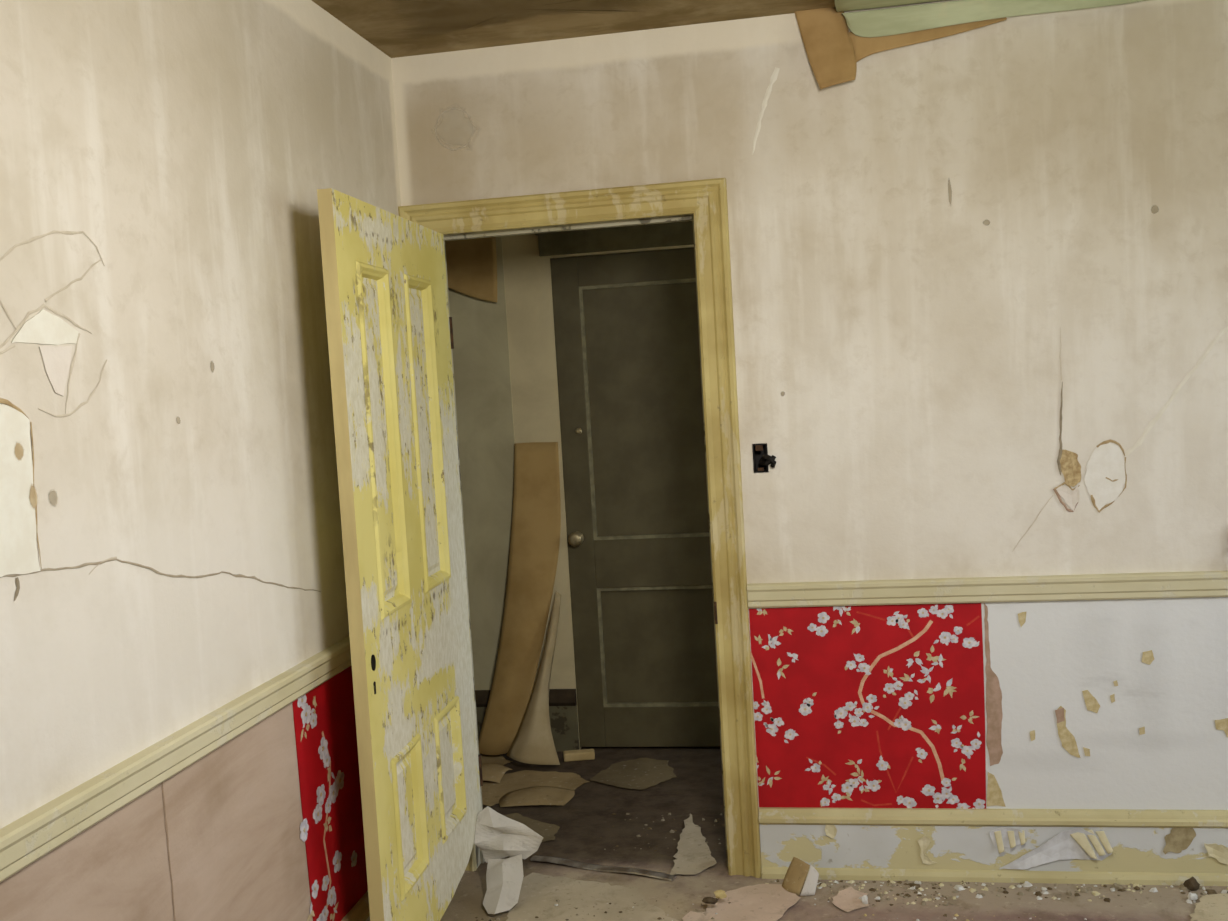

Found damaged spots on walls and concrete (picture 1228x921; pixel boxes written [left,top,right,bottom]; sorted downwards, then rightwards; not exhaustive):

crack [0,230,107,417]
peeling [1012,328,1127,552]
peeling [0,398,42,577]
crack [0,556,321,601]
peeling [1142,650,1154,665]
peeling [984,603,1006,807]
peeling [1055,706,1090,758]
peeling [1082,680,1118,713]
peeling [1215,718,1228,737]
peeling [989,826,1113,870]
peeling [1163,828,1228,864]